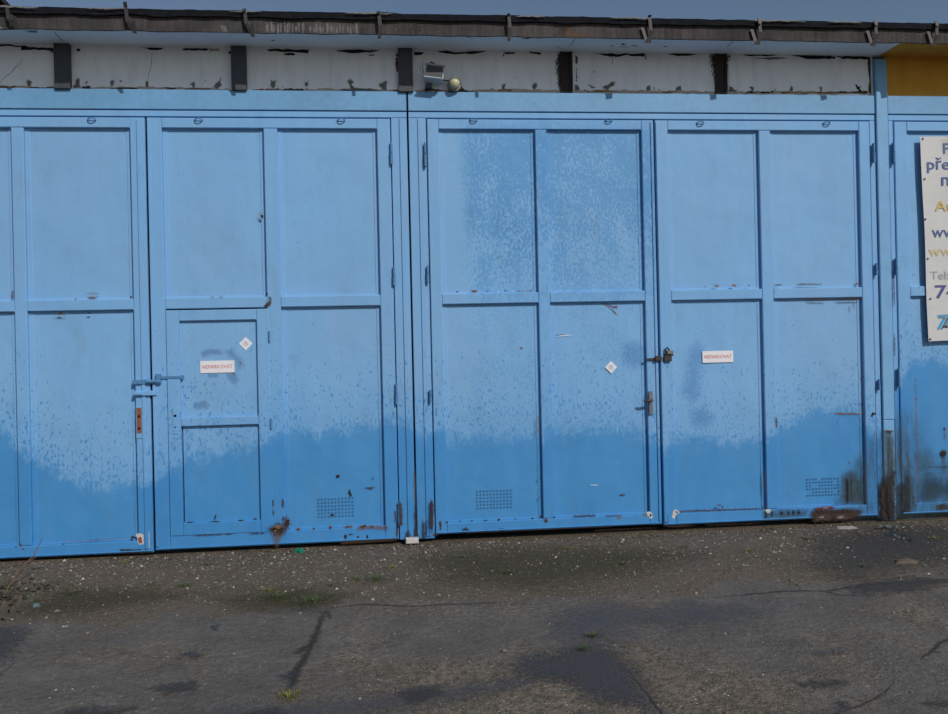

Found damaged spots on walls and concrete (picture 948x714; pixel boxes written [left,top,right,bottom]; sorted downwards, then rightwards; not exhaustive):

spalling [0,79,54,89]
spalling [72,77,230,90]
corrosion [879,430,919,522]
corrosion [253,499,300,544]
corrosion [341,502,403,544]
corrosion [665,472,862,527]